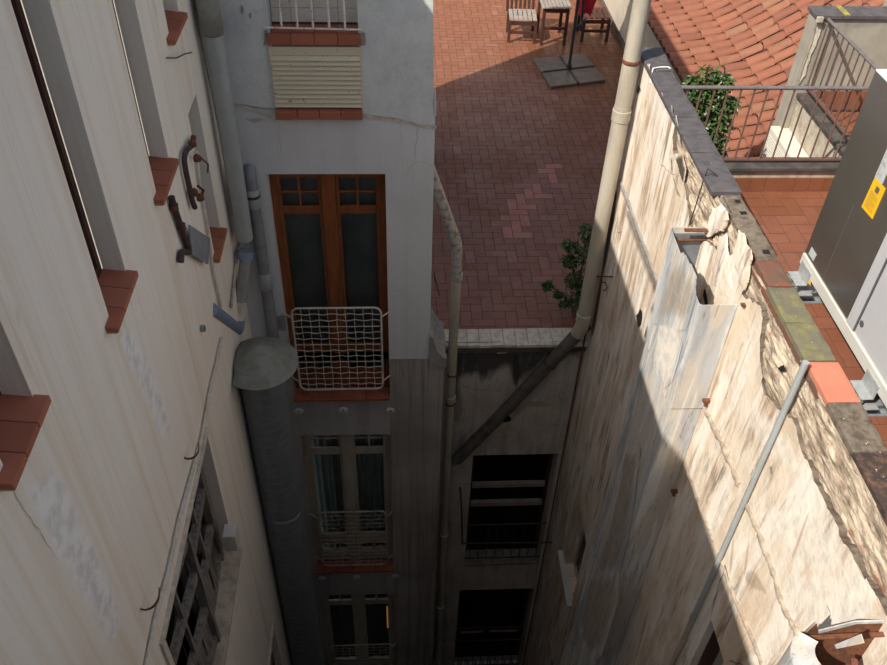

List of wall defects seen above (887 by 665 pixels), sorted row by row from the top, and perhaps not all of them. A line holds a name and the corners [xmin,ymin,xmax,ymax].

spalling [672,127,694,227]
leakage [444,341,561,426]
spalling [729,230,887,616]